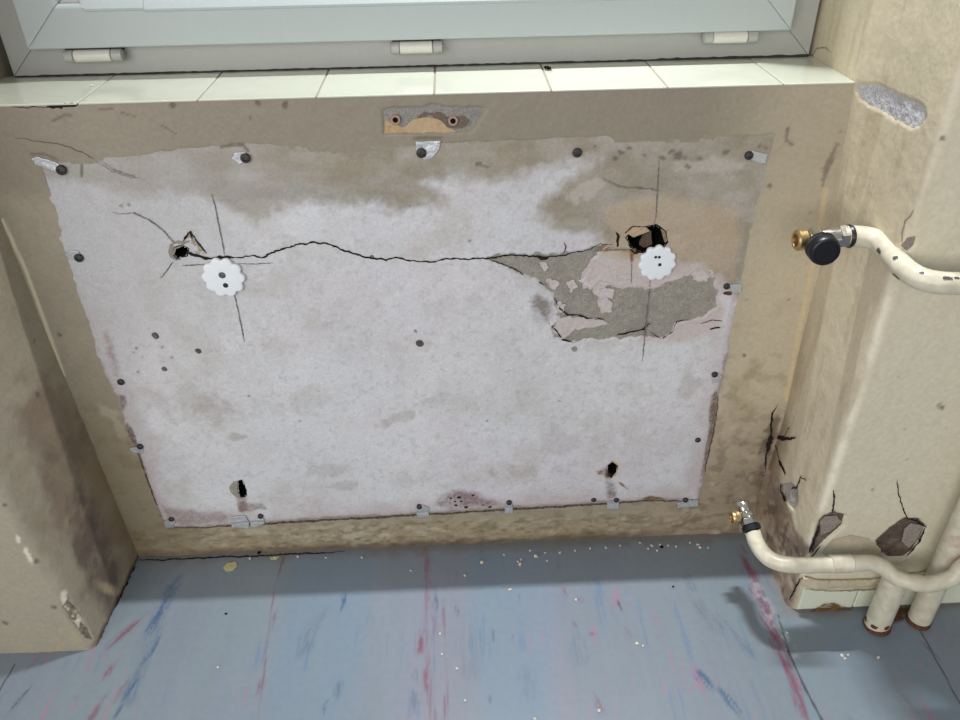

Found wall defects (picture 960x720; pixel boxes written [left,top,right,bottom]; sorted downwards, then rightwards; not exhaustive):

flaking render [857,84,927,128]
crack [113,212,612,263]
flaking render [42,104,775,529]
crack [765,405,796,475]
leakage [447,492,491,508]
flaking render [780,475,806,509]
flaking render [809,490,844,557]
flaking render [876,483,927,557]